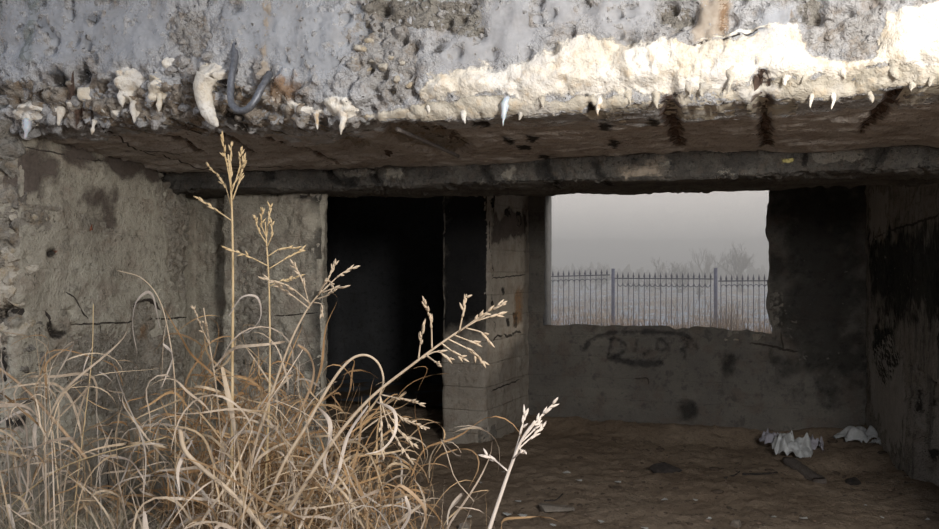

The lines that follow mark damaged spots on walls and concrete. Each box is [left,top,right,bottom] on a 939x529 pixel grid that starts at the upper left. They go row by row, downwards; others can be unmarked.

damp [363,0,939,146]
damp [168,118,252,151]
damp [624,161,669,178]
damp [491,207,527,244]
crack [66,292,187,339]
damp [866,185,939,458]